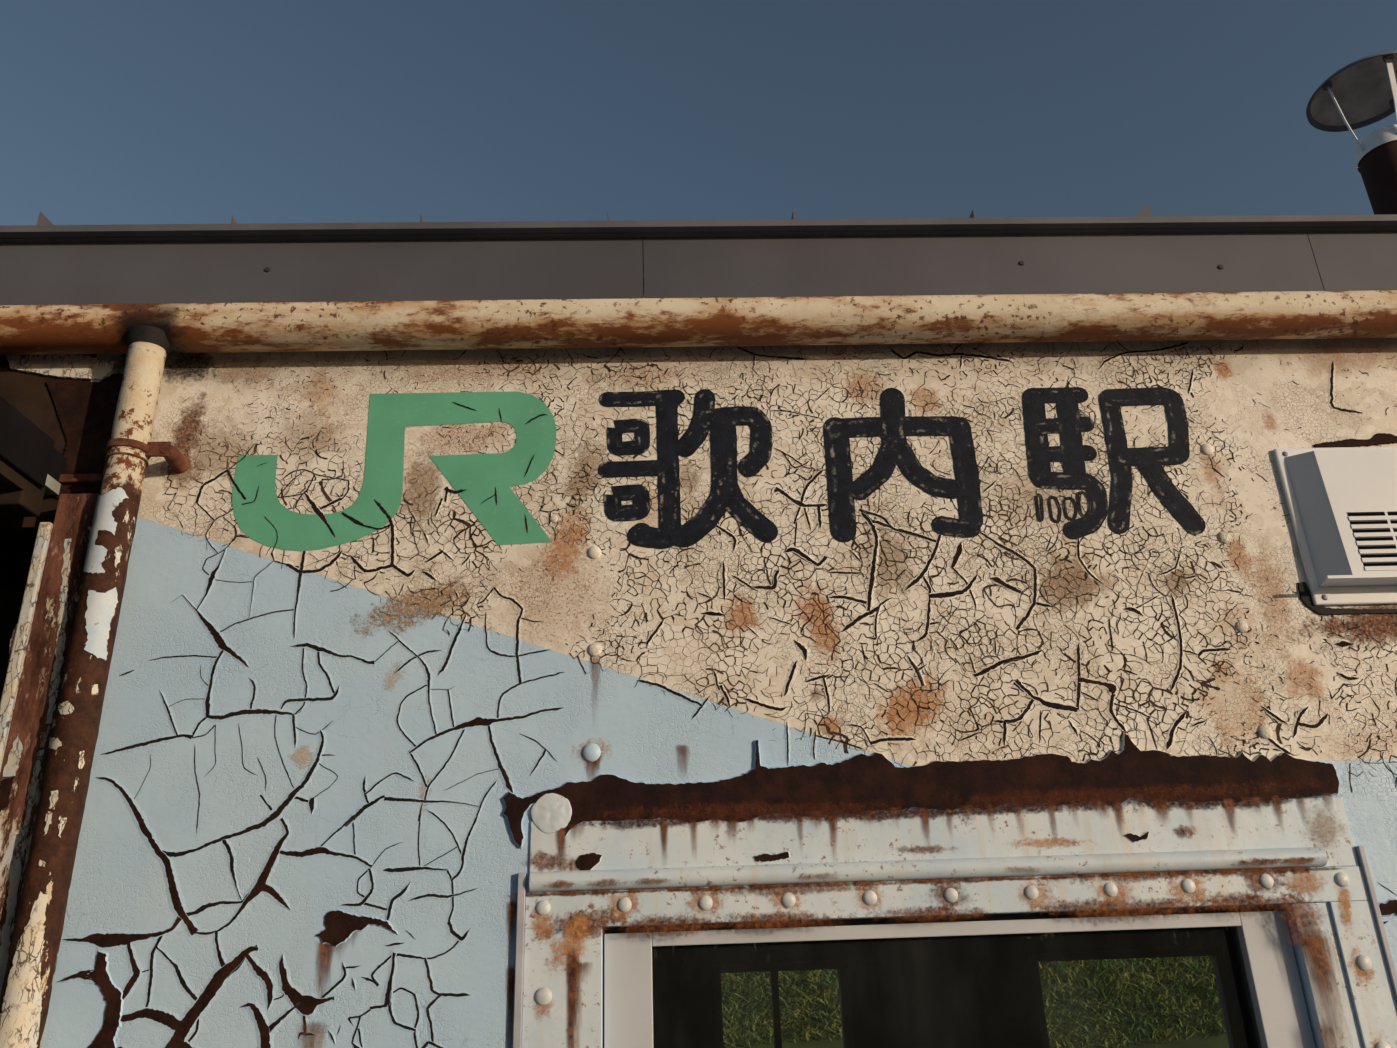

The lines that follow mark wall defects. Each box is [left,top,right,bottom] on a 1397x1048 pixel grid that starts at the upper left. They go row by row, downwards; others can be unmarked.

corrosion [161,353,266,488]
corrosion [1040,557,1114,607]
corrosion [799,590,839,651]
peeling [0,354,128,1048]
crack [57,340,1397,1048]
corrosion [876,676,946,744]
peeling [503,733,1339,849]
peeling [316,909,398,947]
corrosion [508,781,1339,1048]
corrosion [1340,889,1351,925]
peeling [1378,898,1397,917]
corrosion [318,942,333,984]